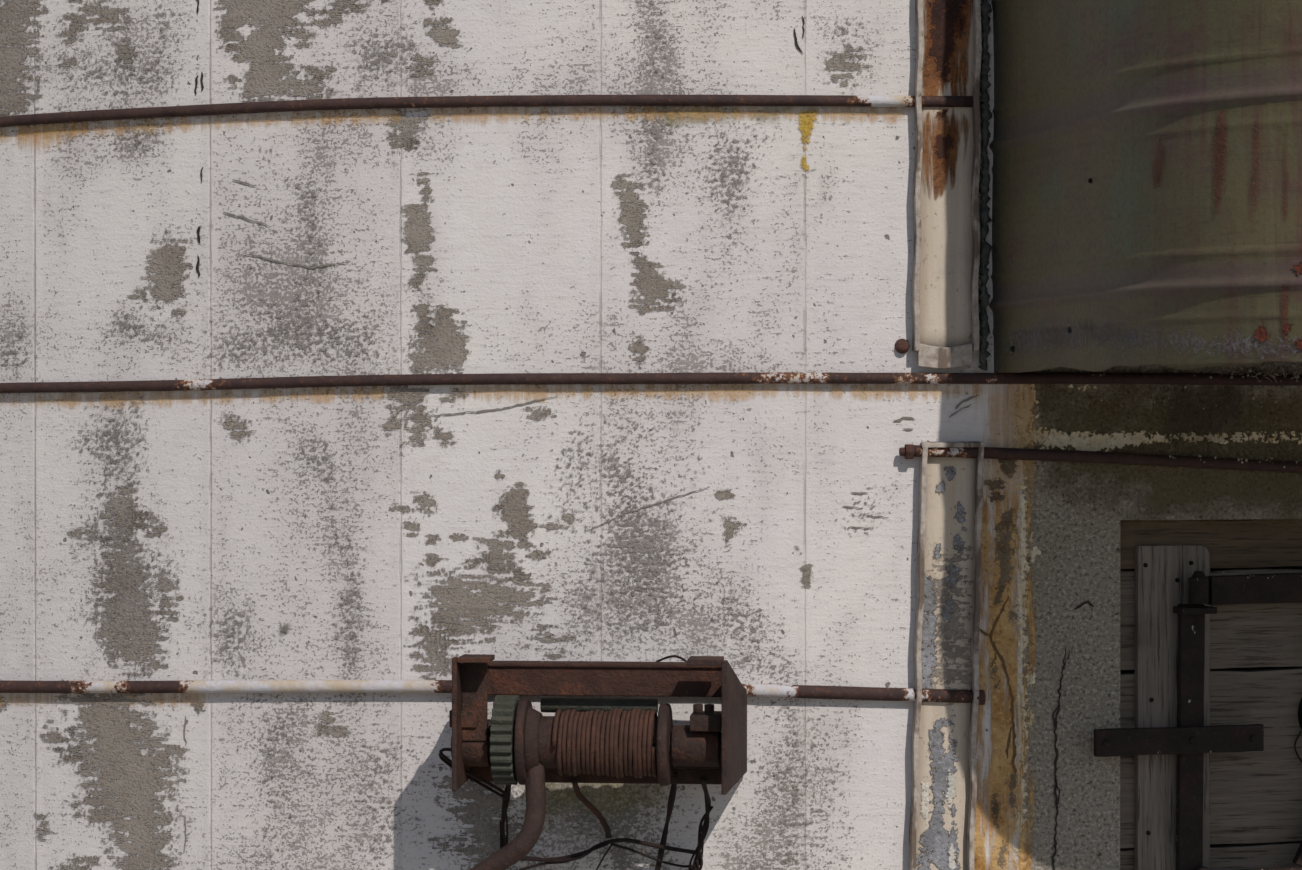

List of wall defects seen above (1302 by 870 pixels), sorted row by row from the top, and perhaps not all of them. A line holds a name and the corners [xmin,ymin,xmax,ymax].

peeling [0,0,190,157]
peeling [187,138,472,451]
peeling [213,0,464,111]
peeling [611,110,687,315]
rust [922,0,973,198]
peeling [36,396,263,870]
peeling [389,390,880,870]
peeling [916,501,974,870]
crack [979,596,1017,788]
rust [974,489,1035,870]
crack [1052,647,1070,870]
peeling [984,384,1302,870]